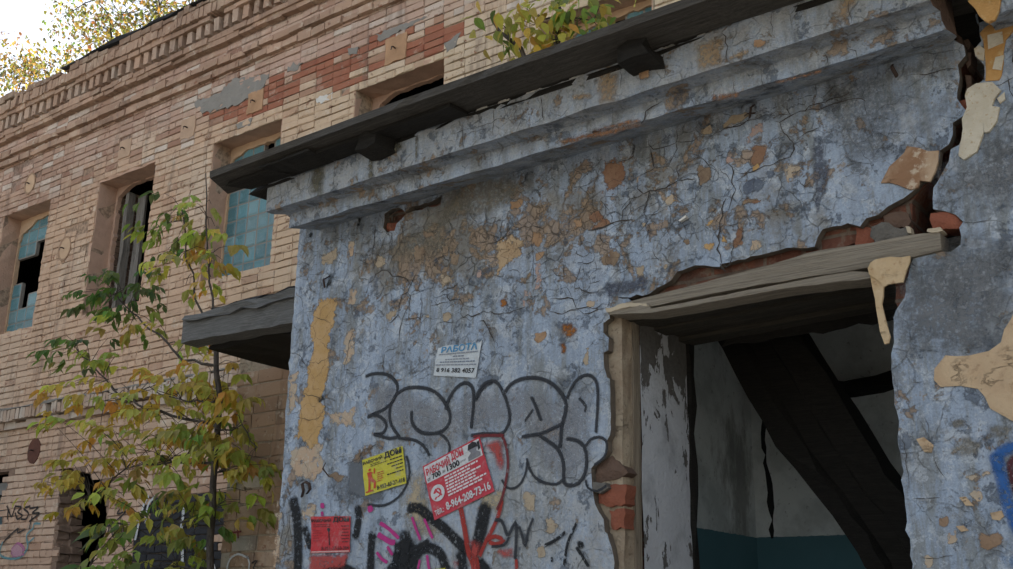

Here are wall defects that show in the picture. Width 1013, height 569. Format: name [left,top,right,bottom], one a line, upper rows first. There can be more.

flaking render [953,0,1013,194]
crack [289,88,867,377]
flaking render [881,146,939,190]
spalling [930,212,963,237]
peeling [287,288,357,482]
flaking render [934,315,1013,436]
spalling [595,456,637,530]
crack [761,421,774,539]
crack [900,436,944,499]